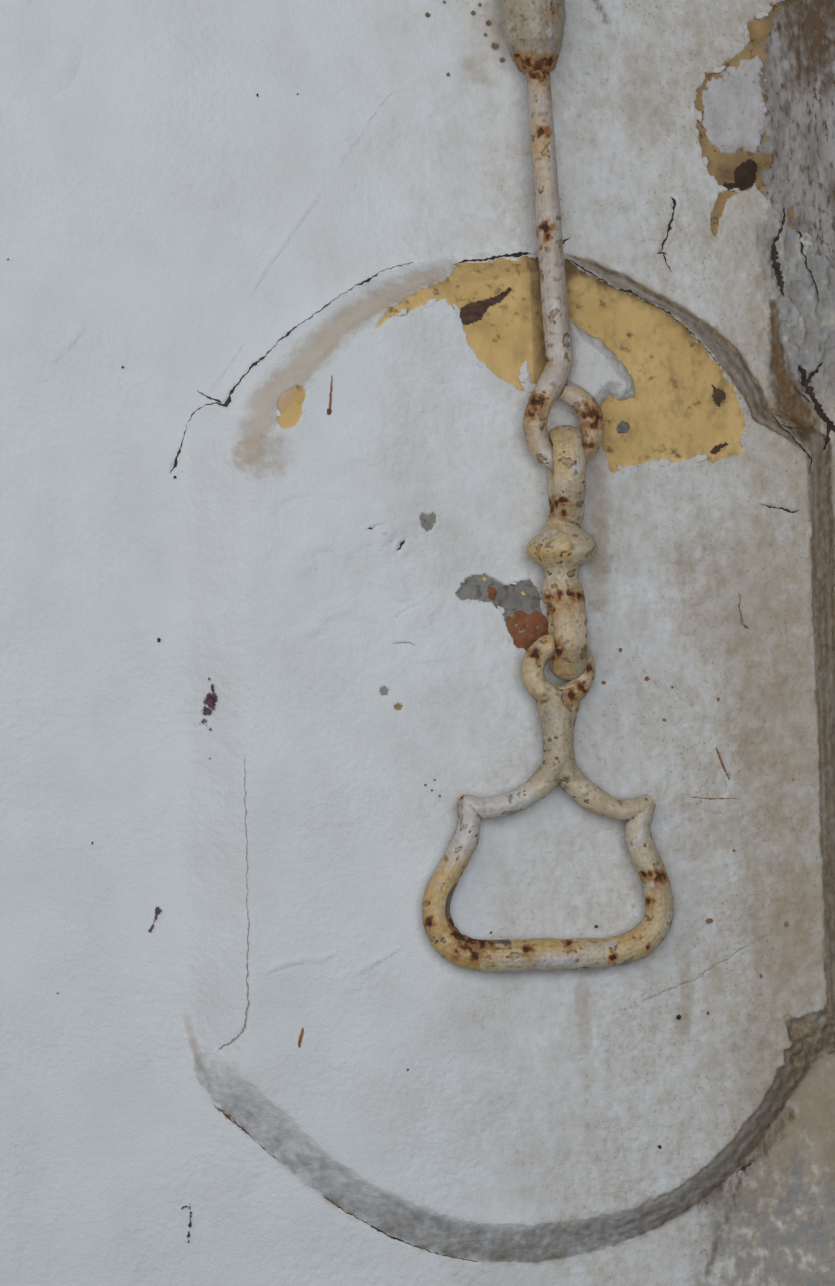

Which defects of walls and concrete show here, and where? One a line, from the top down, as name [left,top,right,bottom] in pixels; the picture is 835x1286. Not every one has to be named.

flaking render [693,0,835,269]
peeling [274,385,306,429]
crack [170,262,414,474]
peeling [375,256,546,393]
peeling [564,258,747,474]
flaking render [455,574,548,651]